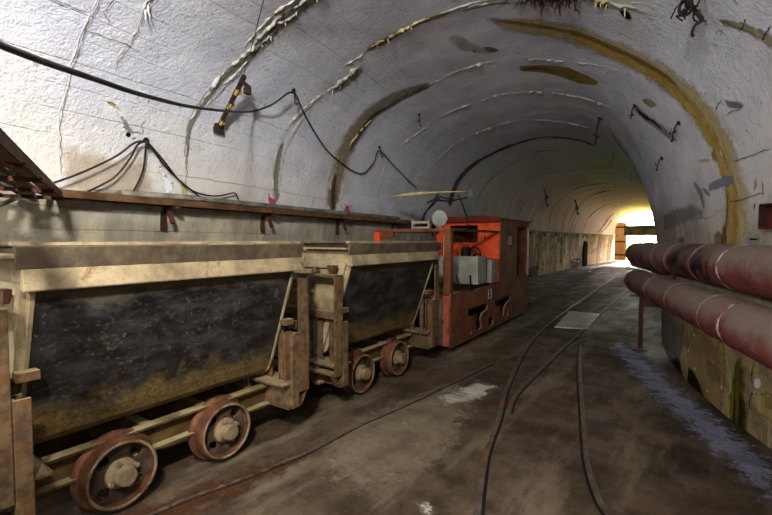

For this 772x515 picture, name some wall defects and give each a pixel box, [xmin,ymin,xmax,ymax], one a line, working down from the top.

crack [56,0,154,179]
leakage [272,12,451,203]
leakage [449,136,594,206]
spalling [514,0,580,18]
leakage [664,176,734,229]
leakage [608,312,772,502]